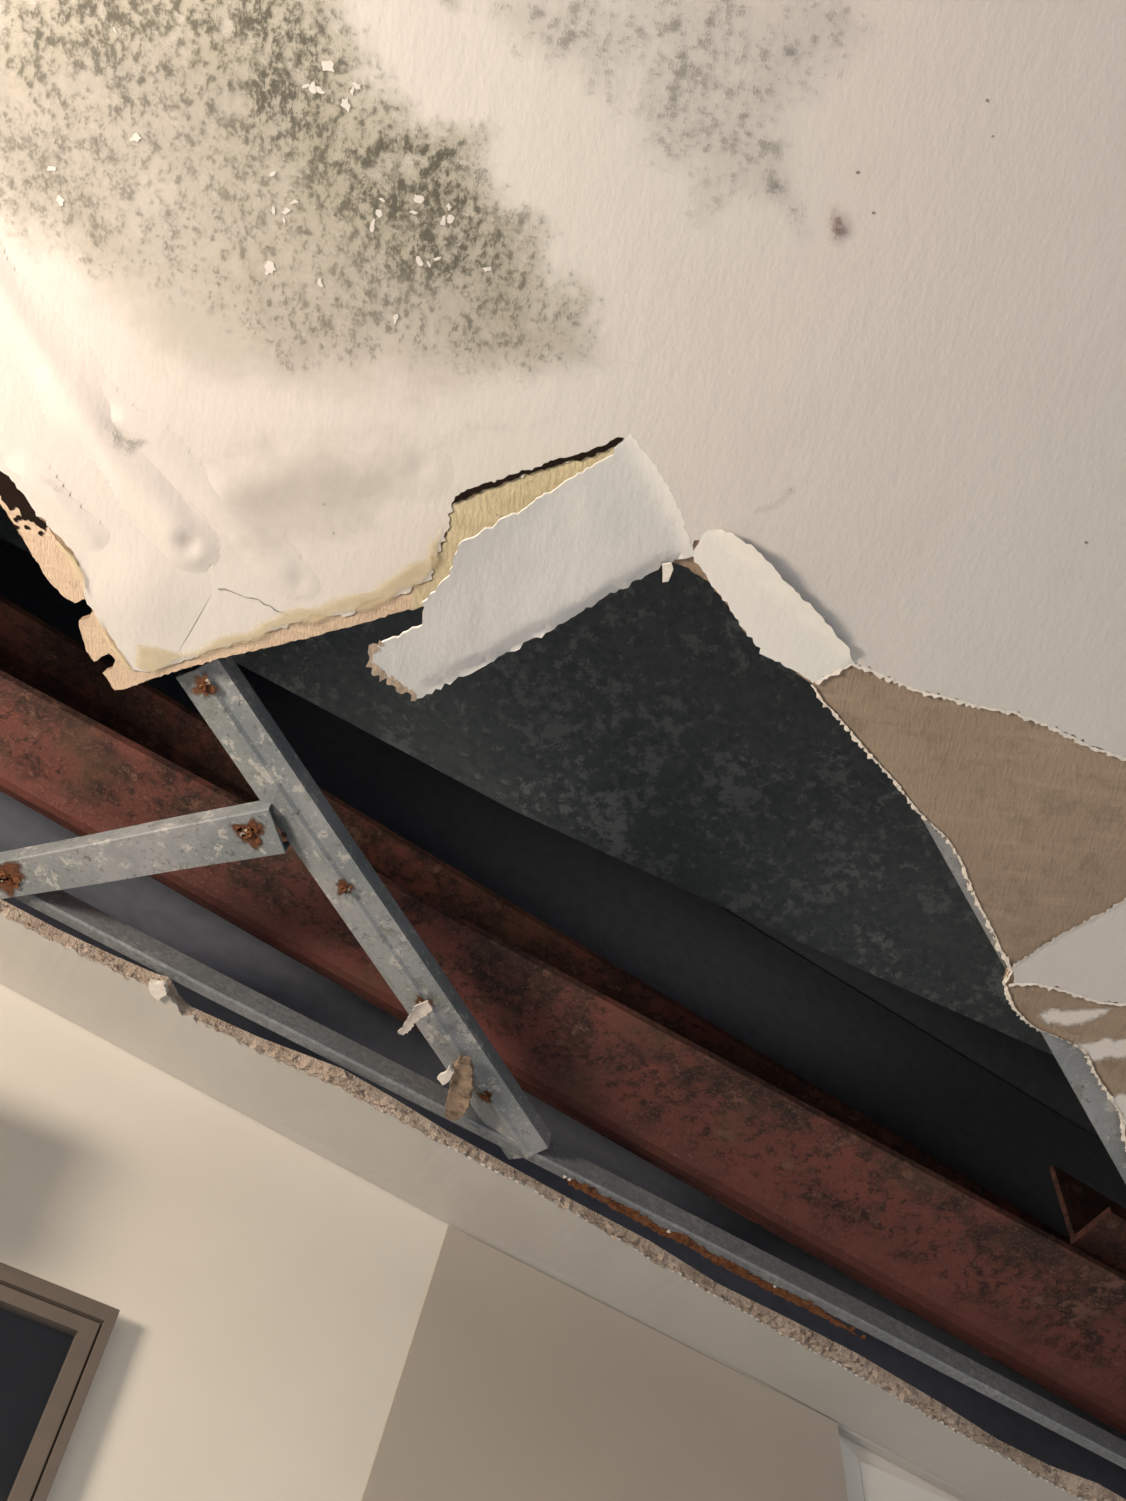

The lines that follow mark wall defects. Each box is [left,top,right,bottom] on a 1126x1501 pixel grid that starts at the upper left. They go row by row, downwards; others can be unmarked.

water stain [0,0,579,356]
water stain [528,0,842,194]
peeling [366,434,694,701]
rust [191,674,218,696]
rust [0,862,24,897]
rust [231,819,264,849]
rust [336,879,355,896]
peeling [815,664,1126,1129]
spalling [0,899,1126,1501]
rust [562,1175,866,1339]